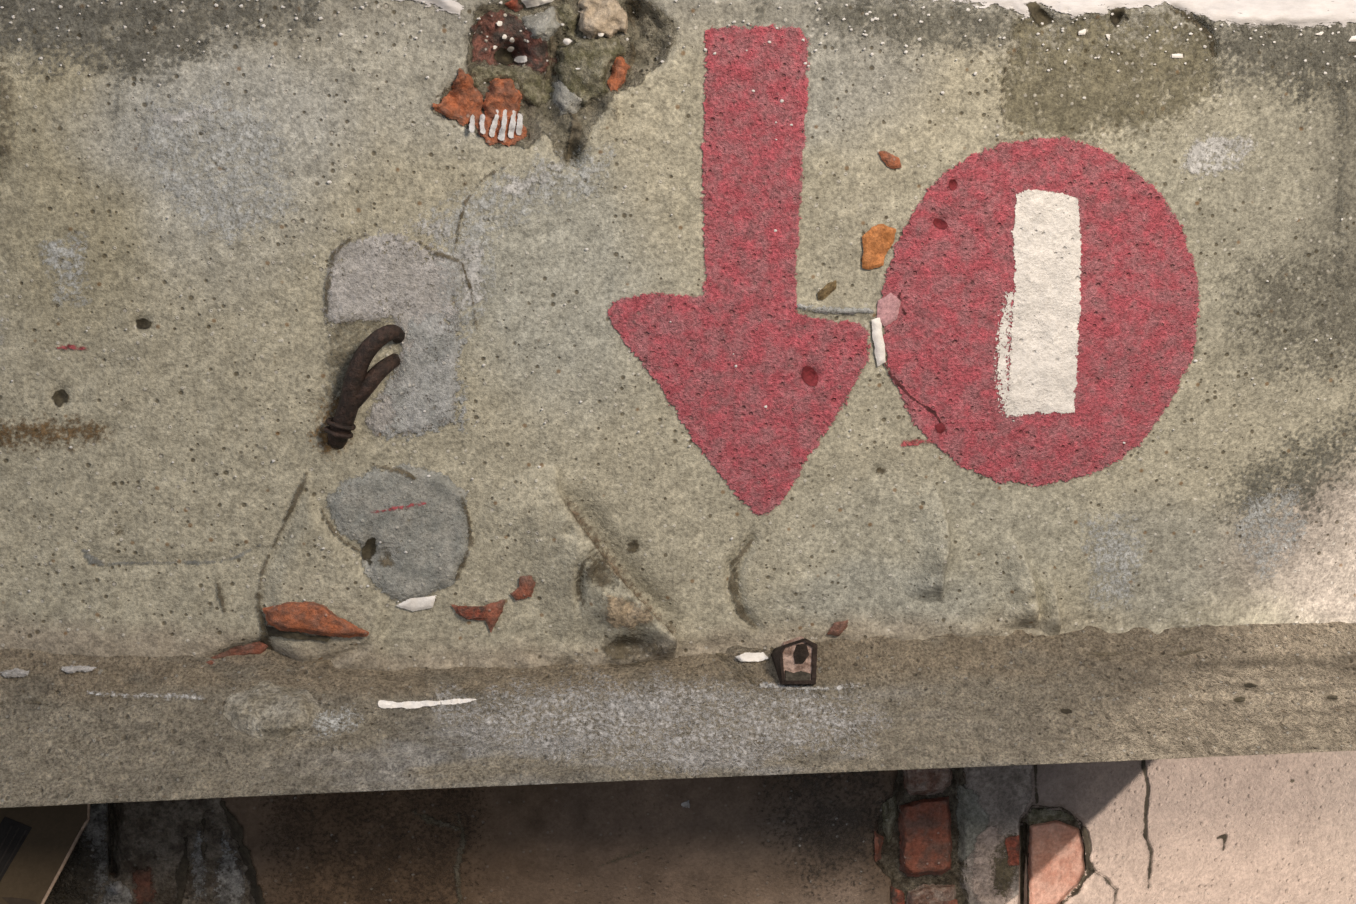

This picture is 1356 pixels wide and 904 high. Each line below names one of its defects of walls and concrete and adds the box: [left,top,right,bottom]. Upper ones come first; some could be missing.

spalling [432,0,676,166]
damp [805,0,1356,384]
rust [0,415,106,451]
rust [307,316,381,461]
damp [1215,395,1356,583]
flaking render [872,768,969,904]
crack [1032,765,1040,804]
flaking render [1019,805,1087,904]
crack [1070,760,1153,904]